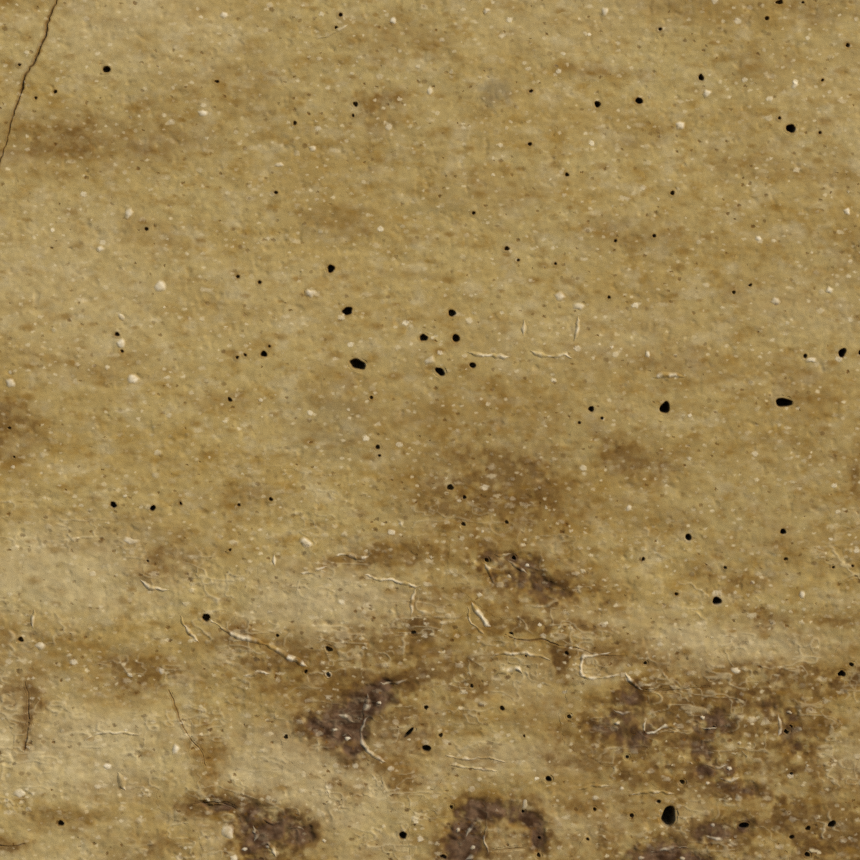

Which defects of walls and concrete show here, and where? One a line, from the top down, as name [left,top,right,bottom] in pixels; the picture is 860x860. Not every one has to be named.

crack [0,0,60,170]
crack [0,841,26,849]